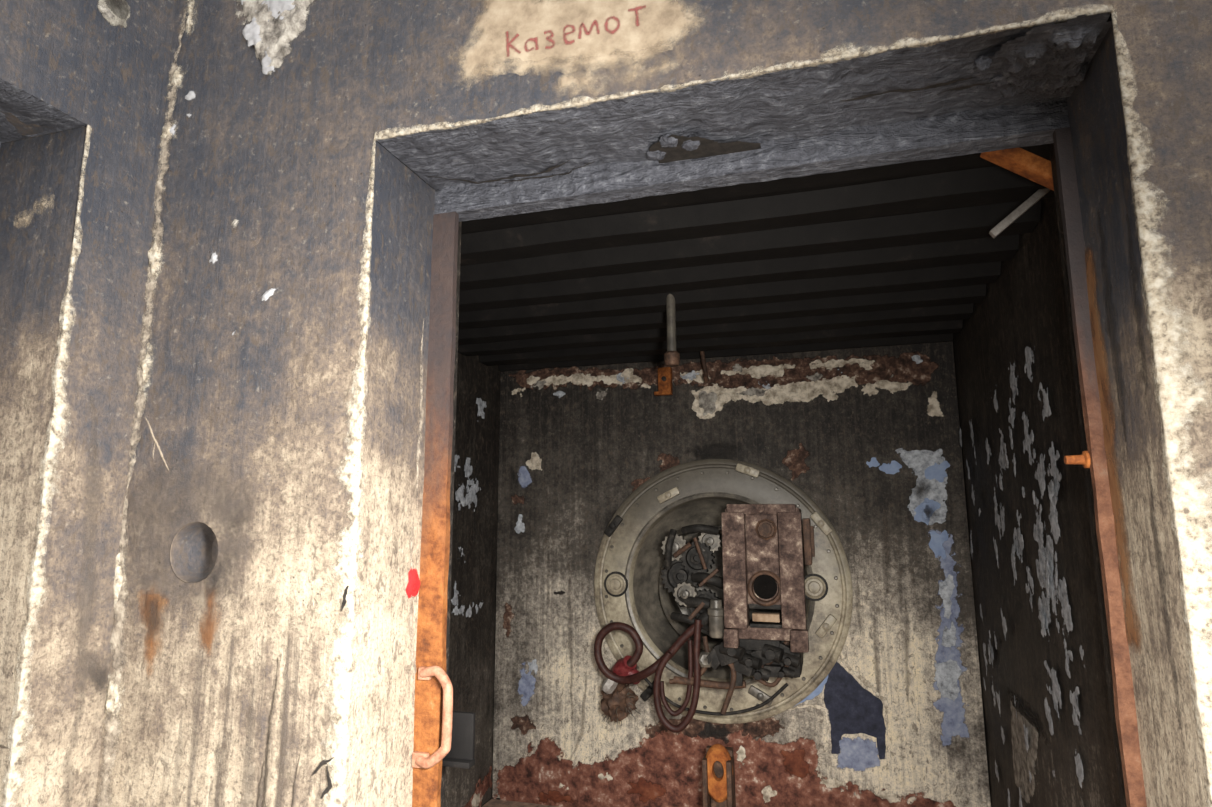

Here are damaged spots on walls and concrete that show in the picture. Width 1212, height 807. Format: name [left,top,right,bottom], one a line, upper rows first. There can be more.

flaking render [235,0,314,75]
flaking render [97,0,196,807]
peeling [476,398,487,419]
peeling [509,351,943,419]
peeling [454,455,481,512]
peeling [511,452,542,534]
rust [142,592,164,661]
rust [202,591,214,649]
peeling [451,581,483,617]
peeling [866,448,969,746]
peeling [959,346,1085,807]
peeling [464,658,956,807]